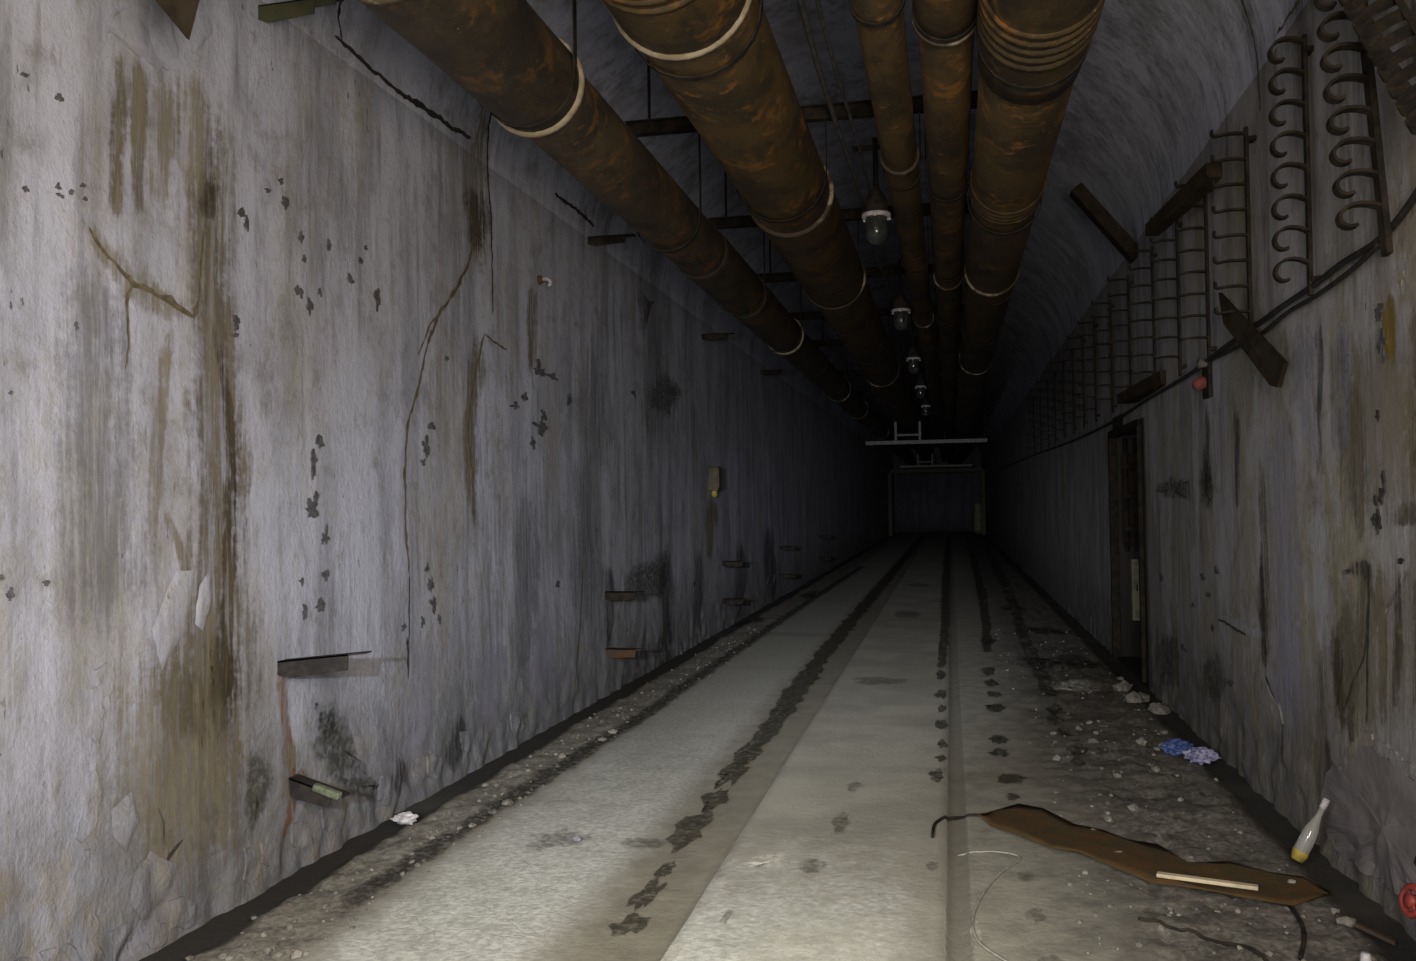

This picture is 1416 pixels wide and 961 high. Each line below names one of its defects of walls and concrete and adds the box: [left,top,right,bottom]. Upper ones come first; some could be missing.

crack [89,224,205,368]
water stain [110,58,260,844]
crack [334,2,507,680]
crack [555,193,595,227]
water stain [1340,266,1416,538]
crack [573,574,583,694]
water stain [1258,438,1332,812]